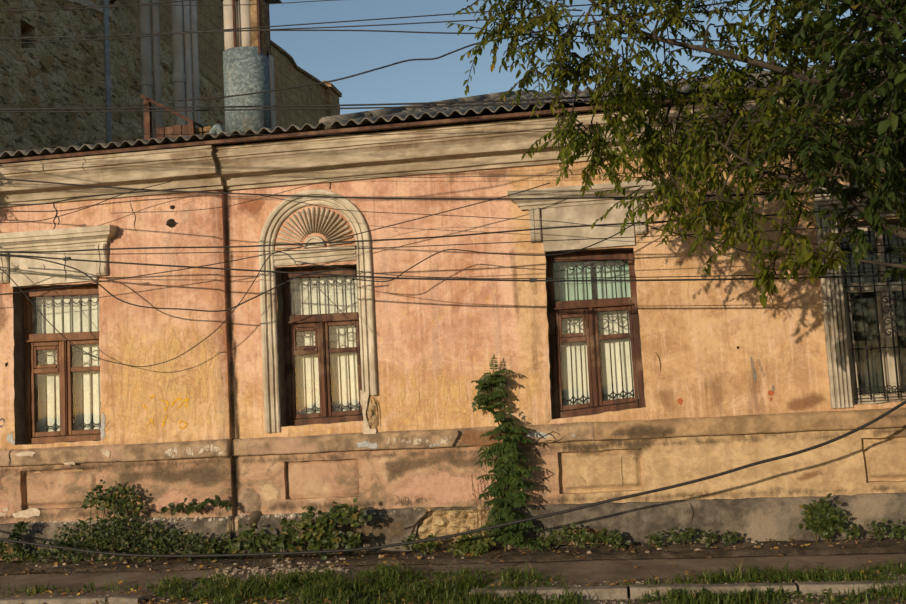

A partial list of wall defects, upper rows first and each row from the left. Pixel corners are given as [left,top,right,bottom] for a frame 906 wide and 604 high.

damp [225,190,239,439]
damp [790,396,822,409]
flaking render [356,389,451,449]
peeling [165,444,224,458]
flaking render [461,429,552,446]
damp [564,426,671,453]
damp [119,456,250,522]
flaking render [0,501,41,518]